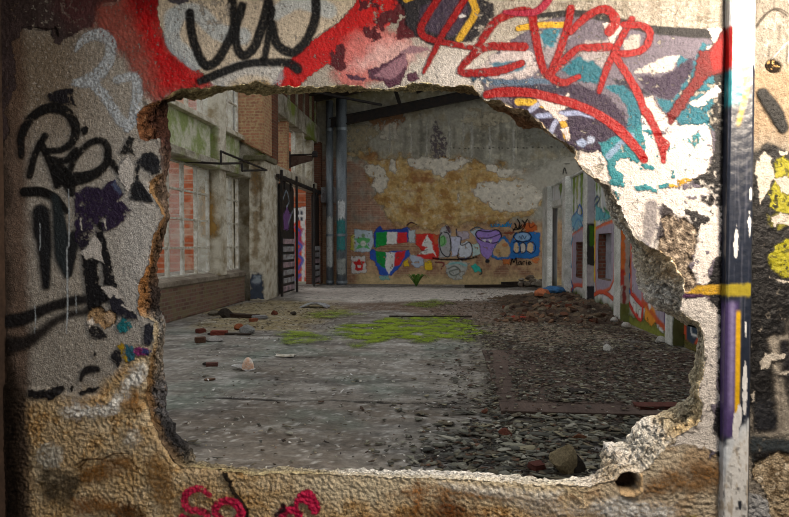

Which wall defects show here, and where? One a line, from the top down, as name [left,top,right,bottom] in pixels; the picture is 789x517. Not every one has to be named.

peeling [602,22,622,44]
peeling [706,26,723,50]
peeling [80,235,105,264]
spalling [87,81,722,498]
crack [222,472,249,517]
spalling [748,451,789,517]